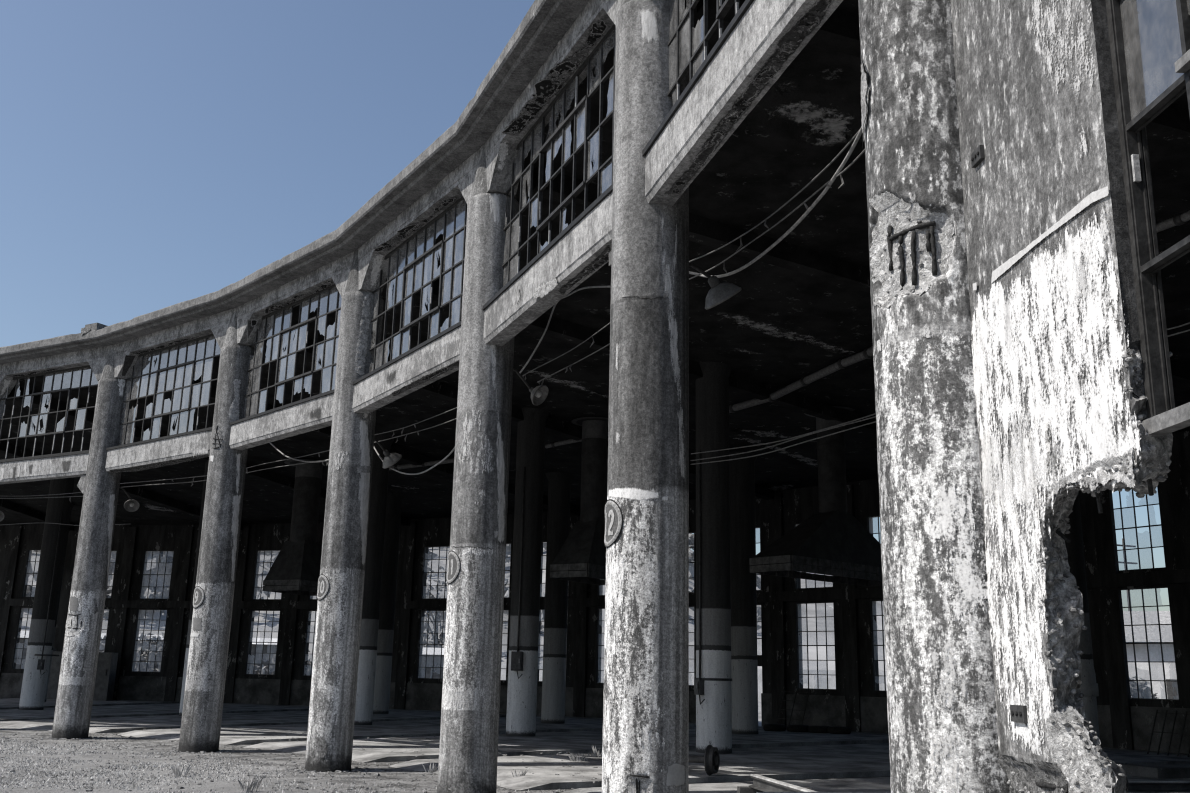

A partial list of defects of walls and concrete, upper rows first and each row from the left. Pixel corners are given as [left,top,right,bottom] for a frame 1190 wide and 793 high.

peeling [502,20,607,135]
leakage [361,371,396,397]
leakage [426,334,460,352]
leakage [490,345,505,543]
leakage [662,214,685,477]
peeling [924,207,1173,793]